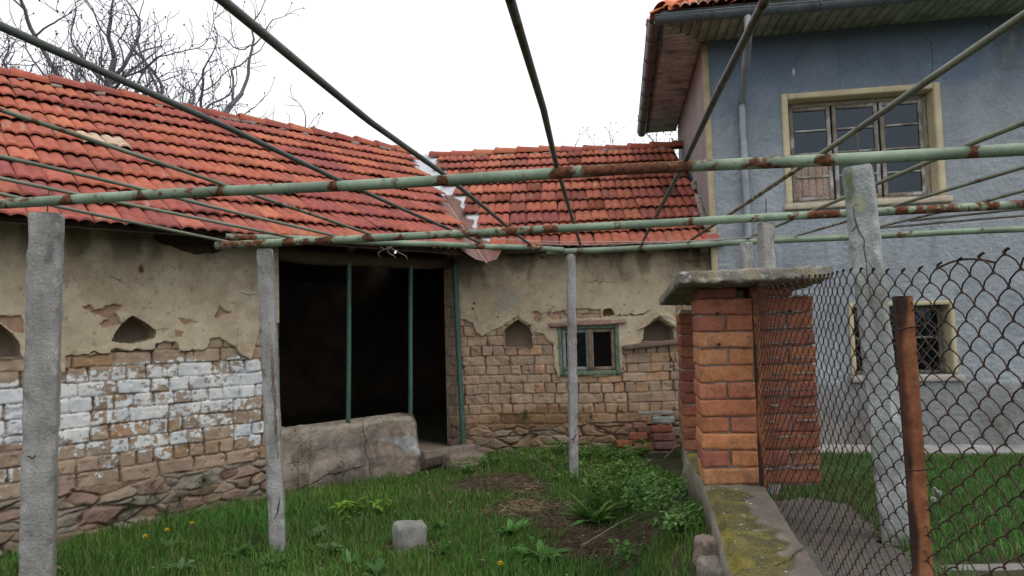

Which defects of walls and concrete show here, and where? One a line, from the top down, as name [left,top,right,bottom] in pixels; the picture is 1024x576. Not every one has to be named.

crack [851,206,875,314]
spalling [0,315,24,334]
spalling [82,304,122,328]
peeling [175,318,198,338]
spalling [532,305,625,324]
crack [273,420,375,520]